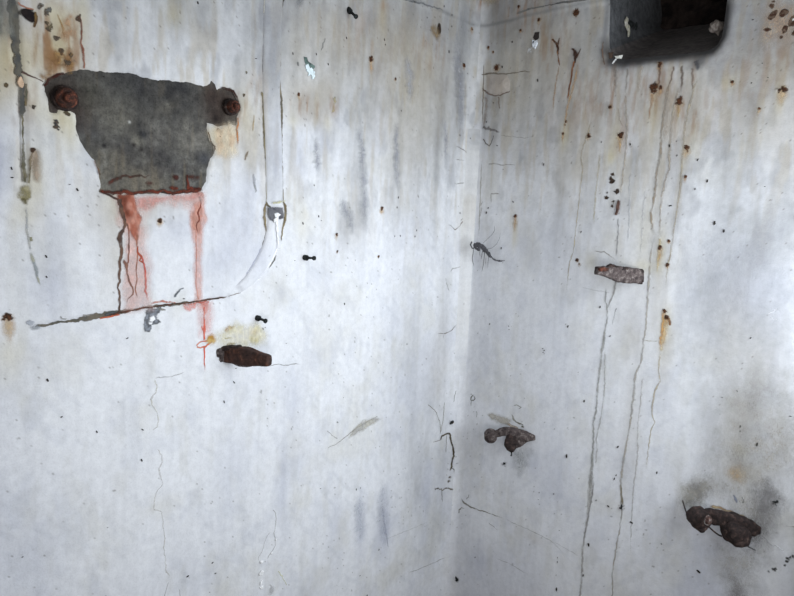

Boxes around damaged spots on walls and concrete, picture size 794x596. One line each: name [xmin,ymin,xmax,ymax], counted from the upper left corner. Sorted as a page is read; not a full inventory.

rust [764,1,794,40]
peeling [38,3,245,200]
crack [26,293,239,329]
rust [117,194,162,312]
rust [173,192,272,367]
rust [594,263,644,284]